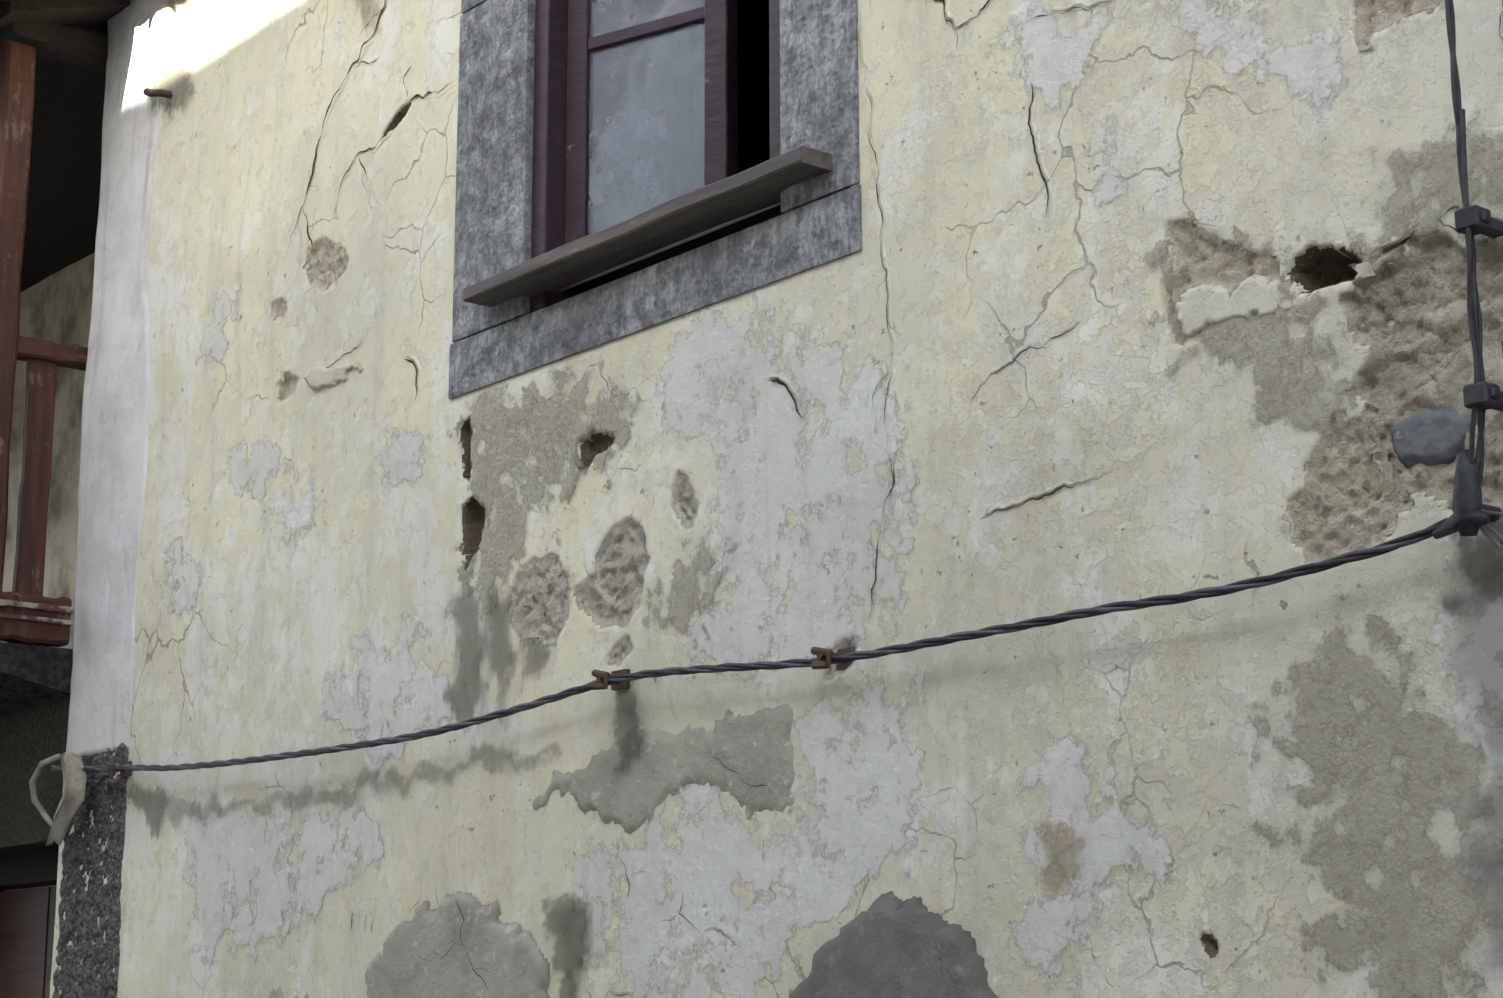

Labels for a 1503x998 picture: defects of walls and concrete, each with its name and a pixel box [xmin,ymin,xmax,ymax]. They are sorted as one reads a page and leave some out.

crack [286,0,458,254]
crack [934,0,990,49]
crack [1028,83,1055,217]
peeling [1165,0,1445,121]
flaking render [299,238,349,291]
crack [858,15,900,612]
crack [969,320,1082,405]
flaking render [1143,112,1503,564]
crack [979,473,1108,520]
peeling [374,293,926,998]
peeling [1239,570,1503,998]
flaking render [1200,934,1219,958]